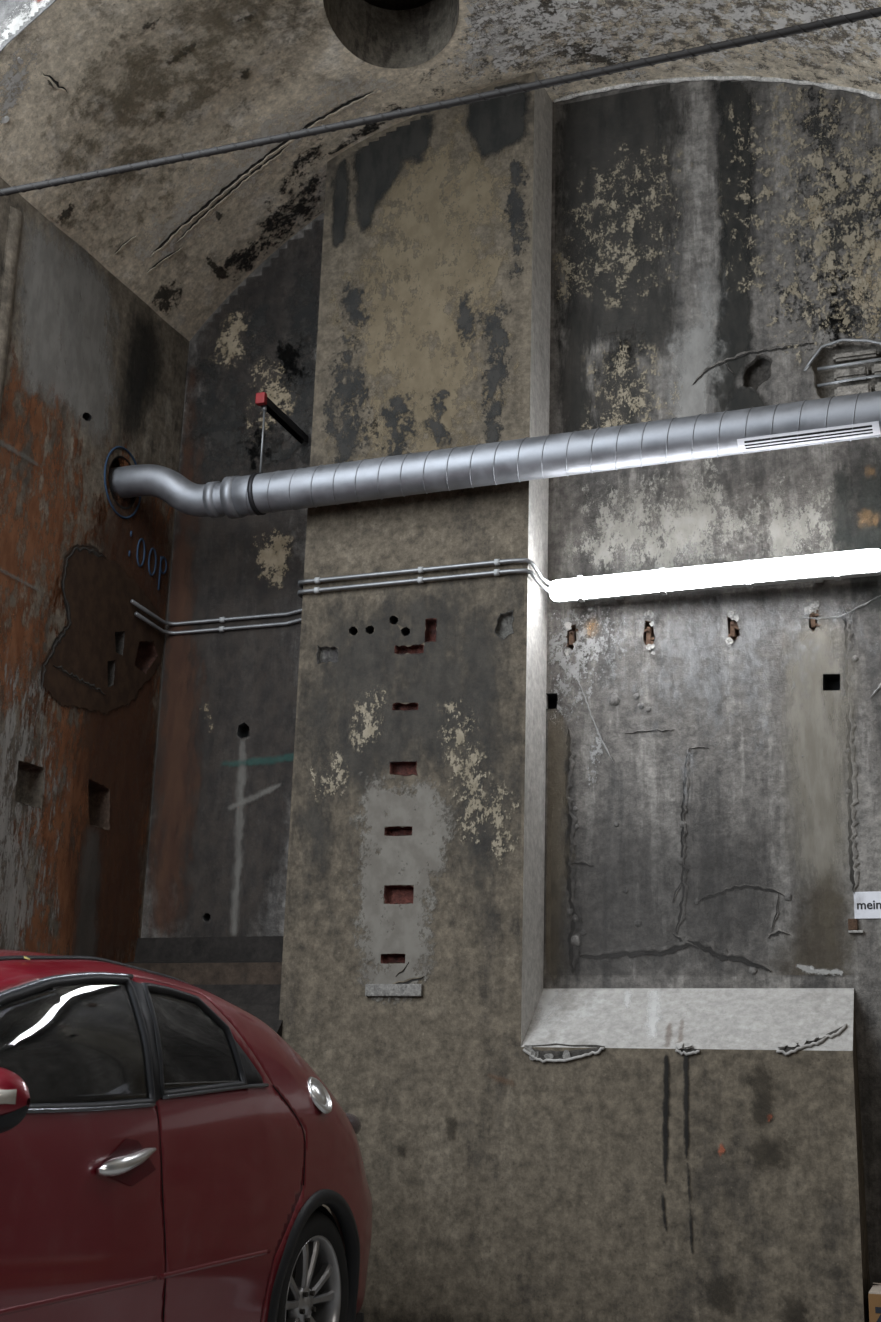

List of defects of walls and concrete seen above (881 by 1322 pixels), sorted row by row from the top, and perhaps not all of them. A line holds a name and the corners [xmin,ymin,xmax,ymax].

crack [42,72,67,93]
crack [115,92,373,273]
damp [134,71,433,267]
damp [467,82,530,279]
peeling [420,0,881,398]
damp [555,80,766,433]
corrosion [0,348,174,963]
peeling [310,690,386,799]
peeling [437,700,519,865]
crack [563,728,790,973]
spalling [523,1043,605,1063]
damp [661,1055,693,1253]